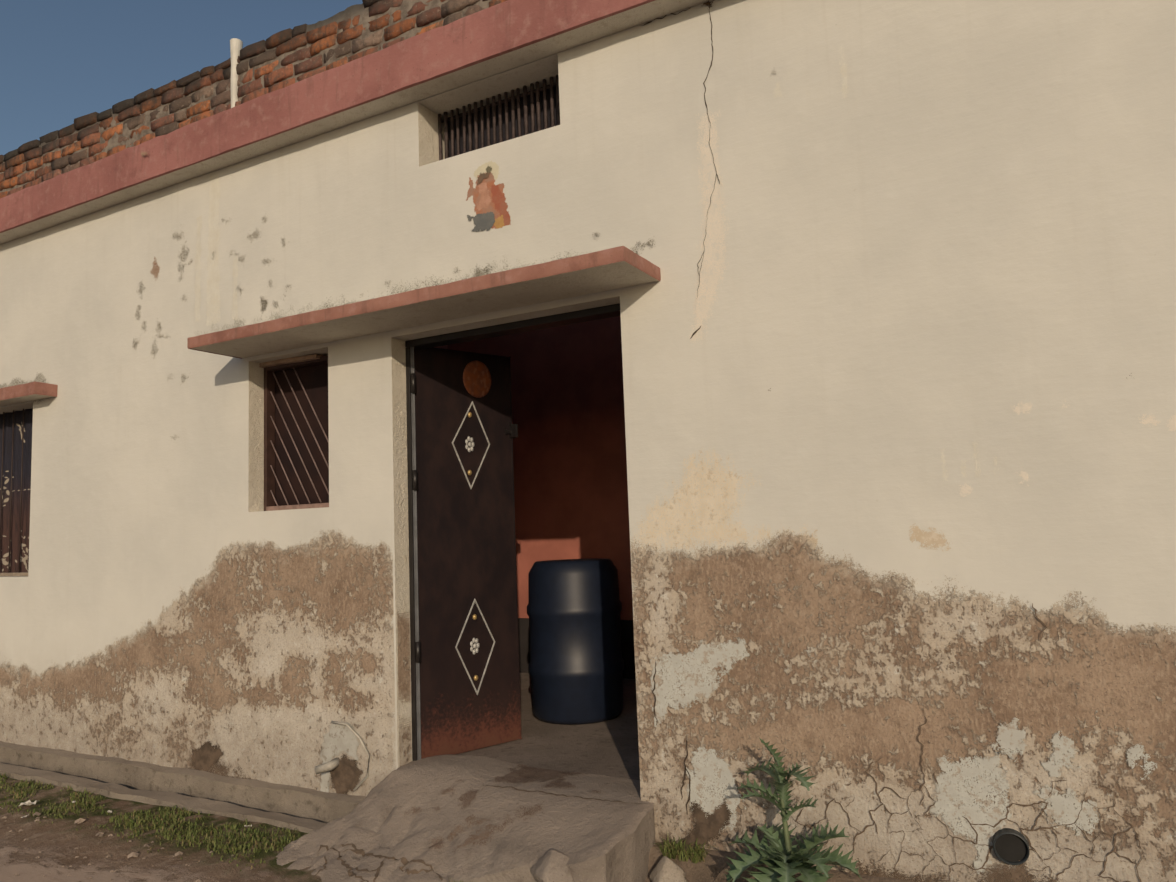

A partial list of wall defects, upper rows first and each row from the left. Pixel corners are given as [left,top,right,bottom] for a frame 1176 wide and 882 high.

crack [640,0,731,344]
peeling [0,528,412,796]
peeling [630,523,1176,882]
crack [1032,603,1047,642]
crack [312,843,443,882]
crack [486,785,646,804]
crack [791,707,1162,882]